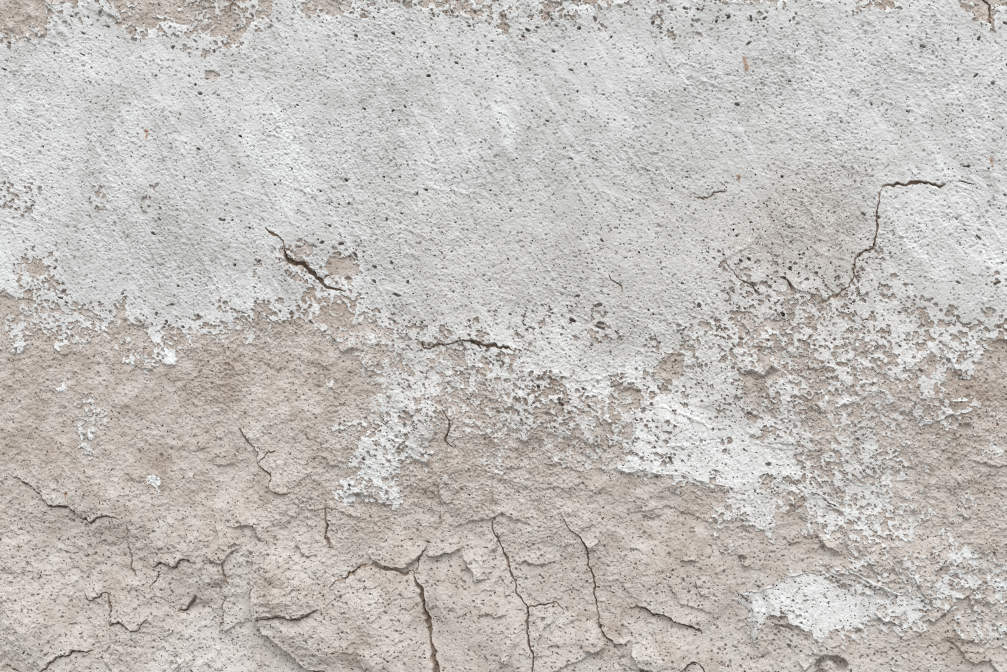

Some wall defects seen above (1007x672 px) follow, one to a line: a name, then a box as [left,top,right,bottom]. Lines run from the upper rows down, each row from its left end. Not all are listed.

peeling [0,0,278,49]
peeling [293,0,797,35]
peeling [852,0,930,16]
peeling [958,0,1007,33]
crack [265,228,347,292]
crack [820,181,977,304]
crack [421,340,515,352]
peeling [0,234,1007,672]
crack [11,475,193,587]
crack [219,547,440,672]
crack [492,519,564,672]
crack [563,519,622,648]